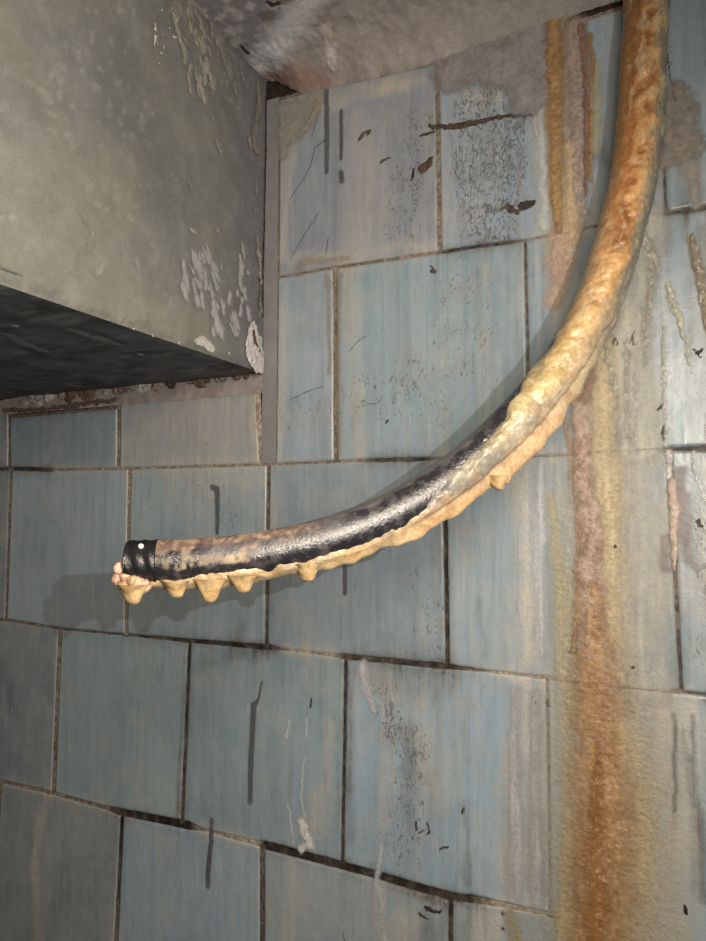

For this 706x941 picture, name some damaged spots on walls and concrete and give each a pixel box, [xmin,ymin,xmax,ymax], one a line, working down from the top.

rust [544,16,602,309]
peeling [0,236,265,413]
leakage [151,0,706,701]
leakage [358,660,376,713]
rust [544,333,674,941]